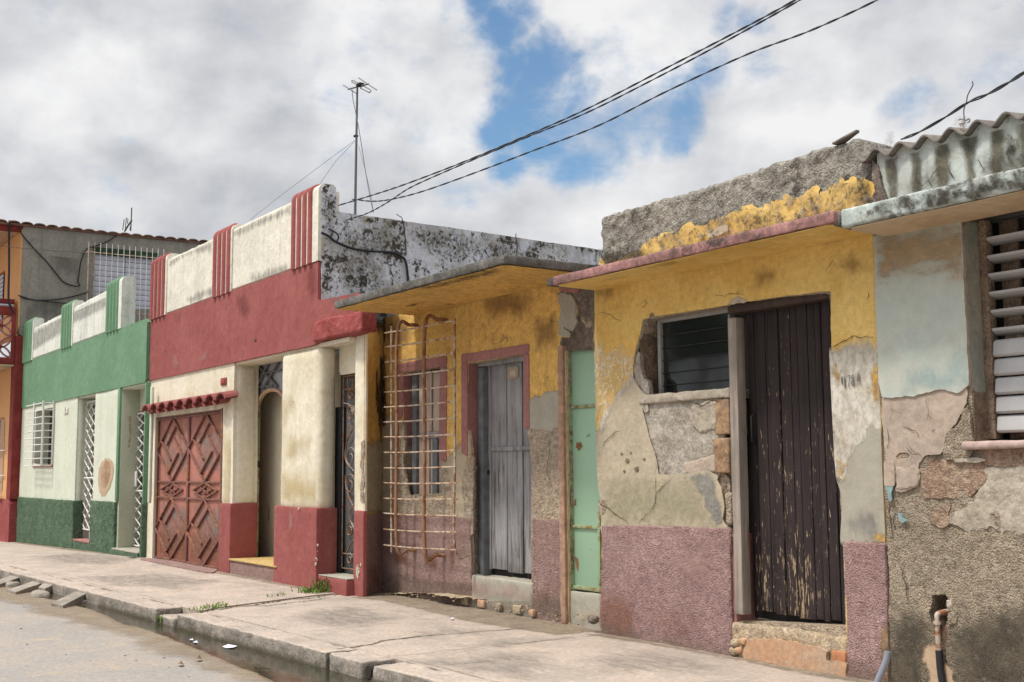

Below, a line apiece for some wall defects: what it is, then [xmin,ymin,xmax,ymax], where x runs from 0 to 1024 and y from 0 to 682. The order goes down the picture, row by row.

damp [868,123,1024,211]
damp [321,197,397,292]
damp [416,230,535,258]
peeling [598,176,876,265]
spalling [557,288,595,351]
spalling [526,391,560,522]
peeling [596,352,733,533]
peeling [829,340,910,545]
spalling [921,405,1024,499]